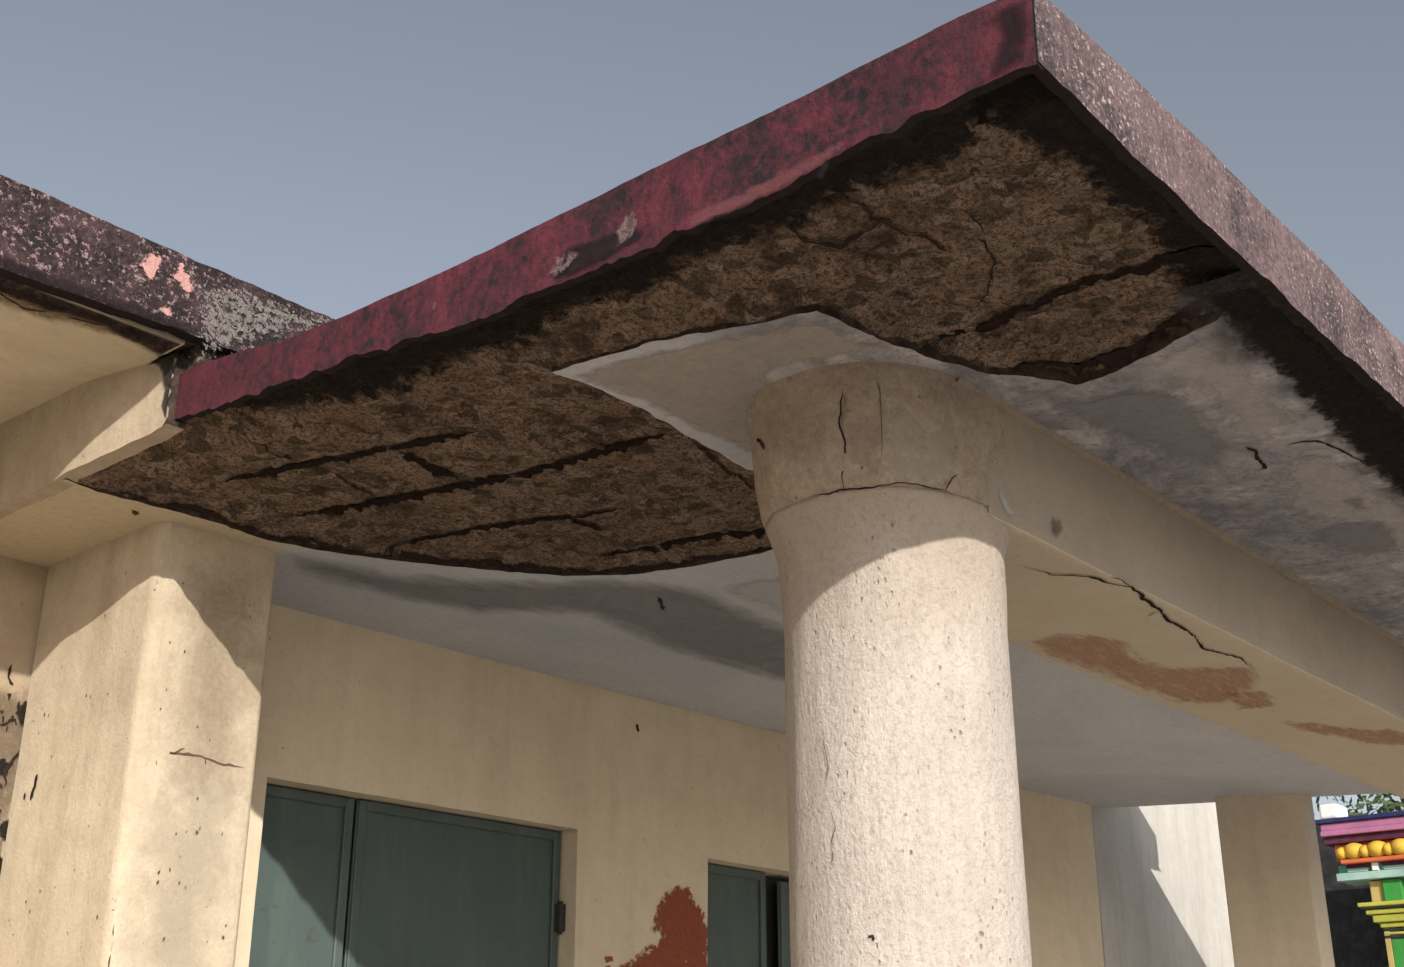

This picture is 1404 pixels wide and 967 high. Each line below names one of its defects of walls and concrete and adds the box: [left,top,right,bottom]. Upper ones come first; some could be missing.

leakage [231,4,1404,496]
spalling [78,110,1217,575]
crack [809,381,958,497]
leakage [1319,523,1392,554]
leakage [310,566,785,677]
crack [1022,566,1253,669]
leakage [0,664,39,874]
peeling [605,885,709,967]